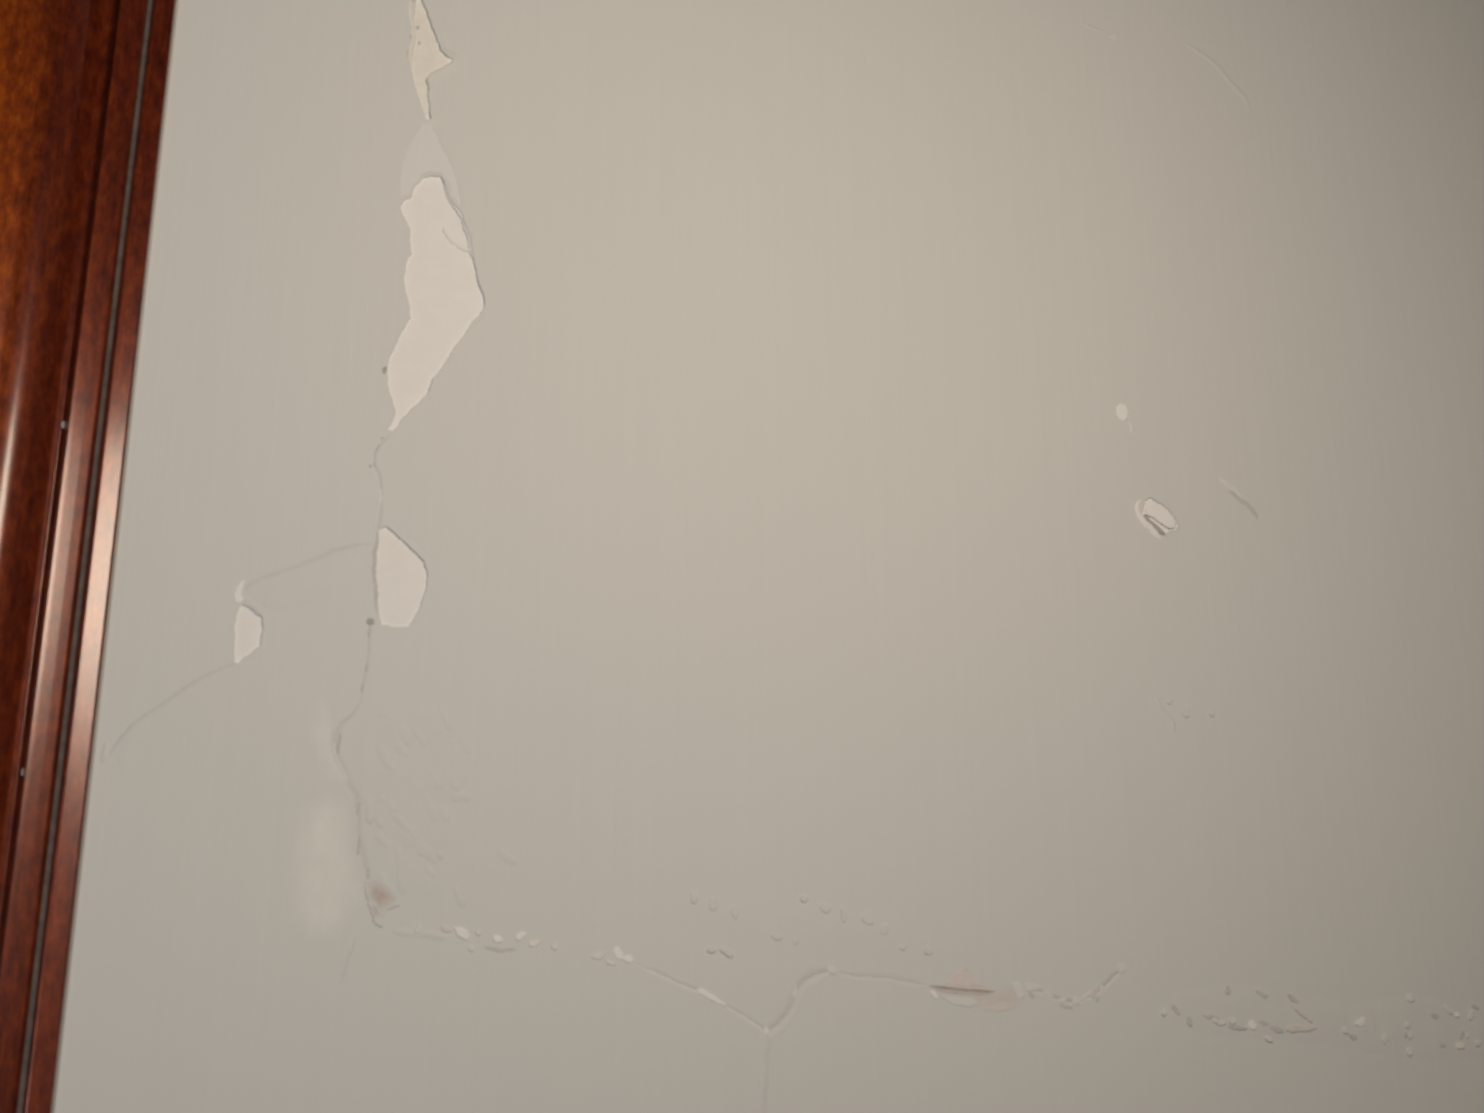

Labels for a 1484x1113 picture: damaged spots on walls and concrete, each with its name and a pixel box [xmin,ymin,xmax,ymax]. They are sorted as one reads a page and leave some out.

peeling [382,0,494,436]
peeling [1135,493,1181,539]
peeling [228,580,271,667]
peeling [366,521,434,631]